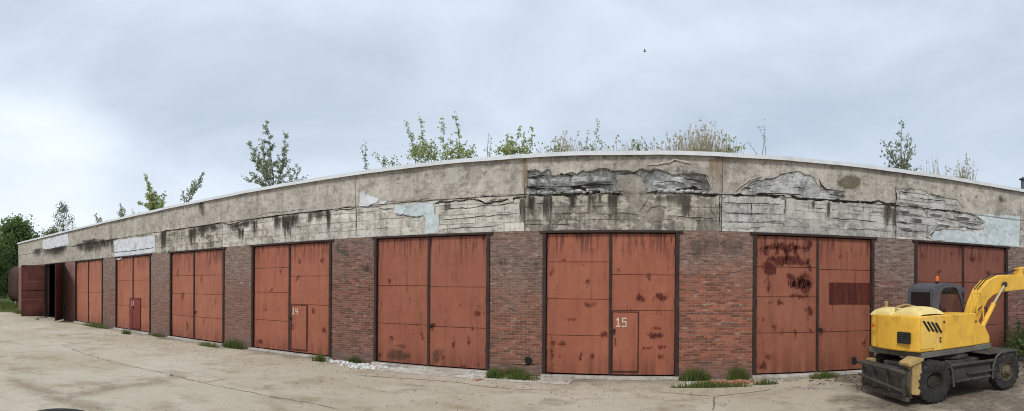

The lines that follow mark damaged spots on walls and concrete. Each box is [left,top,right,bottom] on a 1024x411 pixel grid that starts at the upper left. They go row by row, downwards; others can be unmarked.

peeling [43,234,69,249]
peeling [114,235,155,260]
leakage [188,225,216,243]
leakage [230,220,257,238]
leakage [274,210,331,234]
peeling [359,190,439,234]
spalling [525,158,846,243]
spalling [895,189,1020,247]
corrosion [759,239,813,315]
corrosion [637,293,669,359]